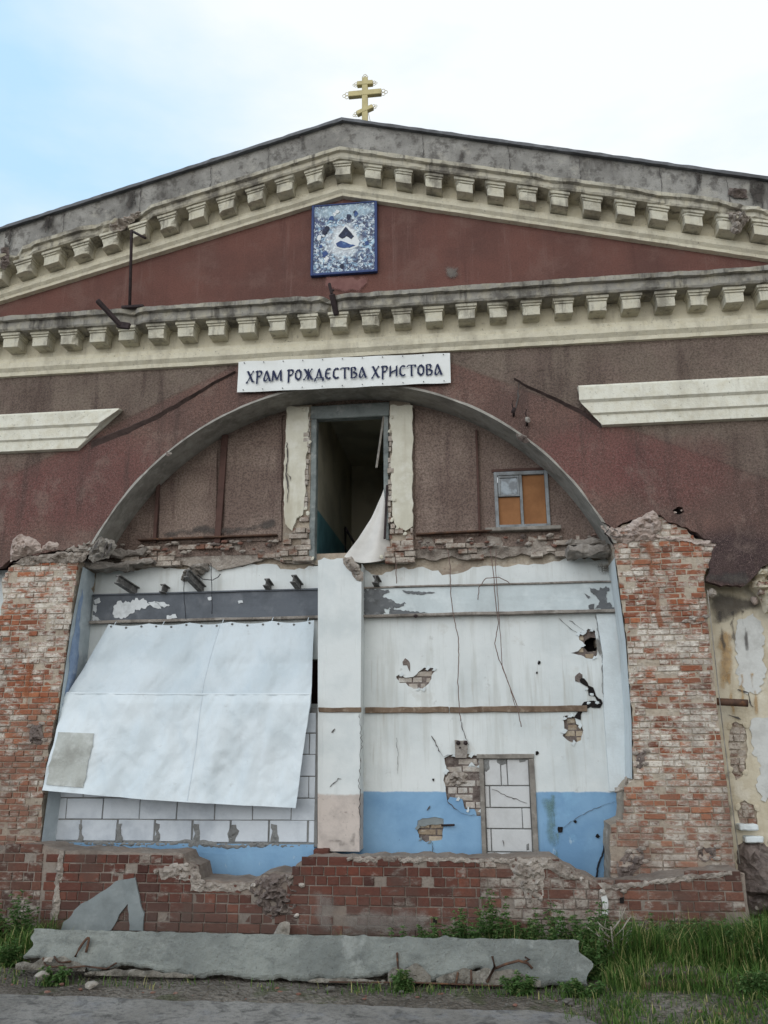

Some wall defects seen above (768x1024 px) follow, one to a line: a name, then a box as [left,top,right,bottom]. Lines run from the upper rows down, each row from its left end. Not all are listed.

spalling [380,410,416,564]
peeling [113,598,177,619]
peeling [343,556,435,615]
peeling [584,586,614,609]
spalling [396,658,436,691]
hole [574,628,597,660]
peeling [735,614,767,695]
spalling [561,713,583,746]
spalling [432,752,481,816]
peeling [727,717,768,824]
spalling [415,817,455,844]
spalling [153,863,305,919]